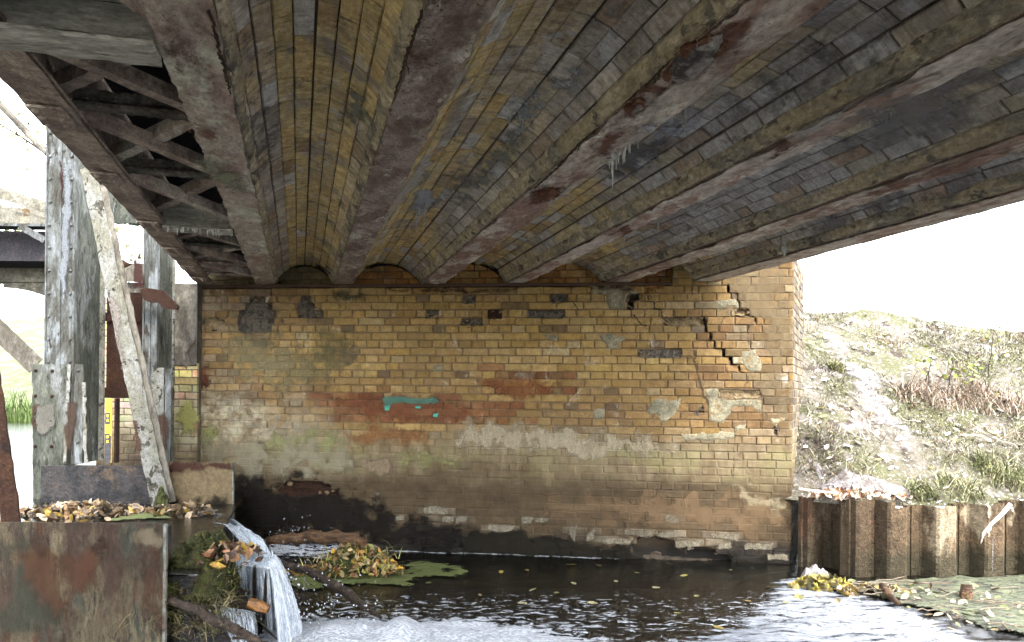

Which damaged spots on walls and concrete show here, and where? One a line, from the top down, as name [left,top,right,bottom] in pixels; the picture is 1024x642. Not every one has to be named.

rust [590,22,751,164]
spalling [237,297,275,334]
spalling [297,297,324,319]
crack [633,285,779,429]
rust [484,376,561,399]
rust [336,392,471,445]
efflorescence [456,417,677,462]
leakage [196,435,788,564]